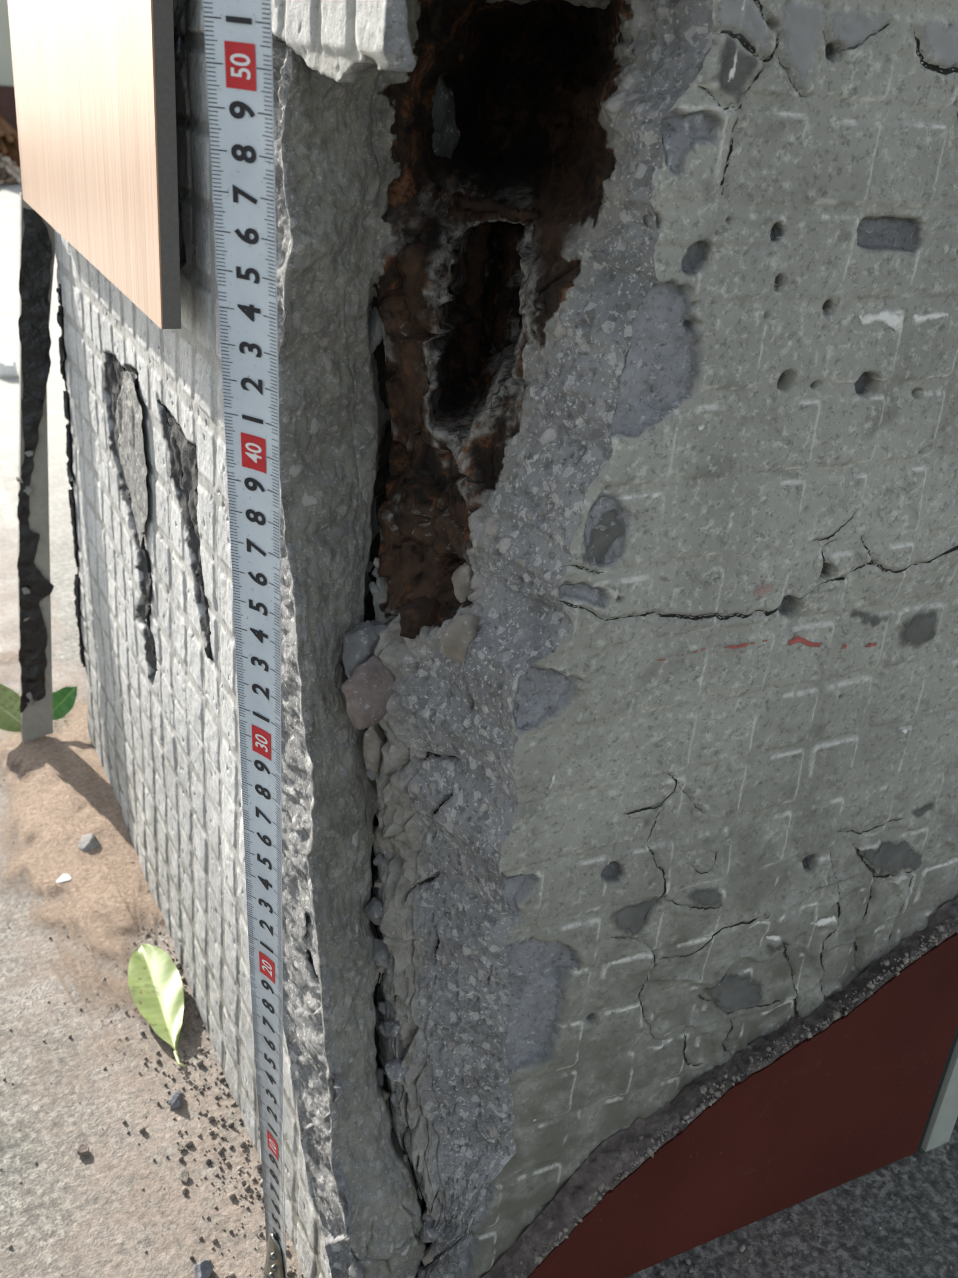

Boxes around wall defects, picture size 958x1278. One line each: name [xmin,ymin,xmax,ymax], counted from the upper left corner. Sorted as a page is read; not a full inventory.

crack [698,0,808,194]
crack [823,23,958,74]
rust [382,244,435,455]
spalling [160,403,211,643]
crack [364,339,467,622]
rust [377,496,473,610]
spalling [272,0,715,1278]
crack [559,512,958,621]
crack [369,816,437,939]
crack [611,773,915,1067]
crack [374,972,441,1208]